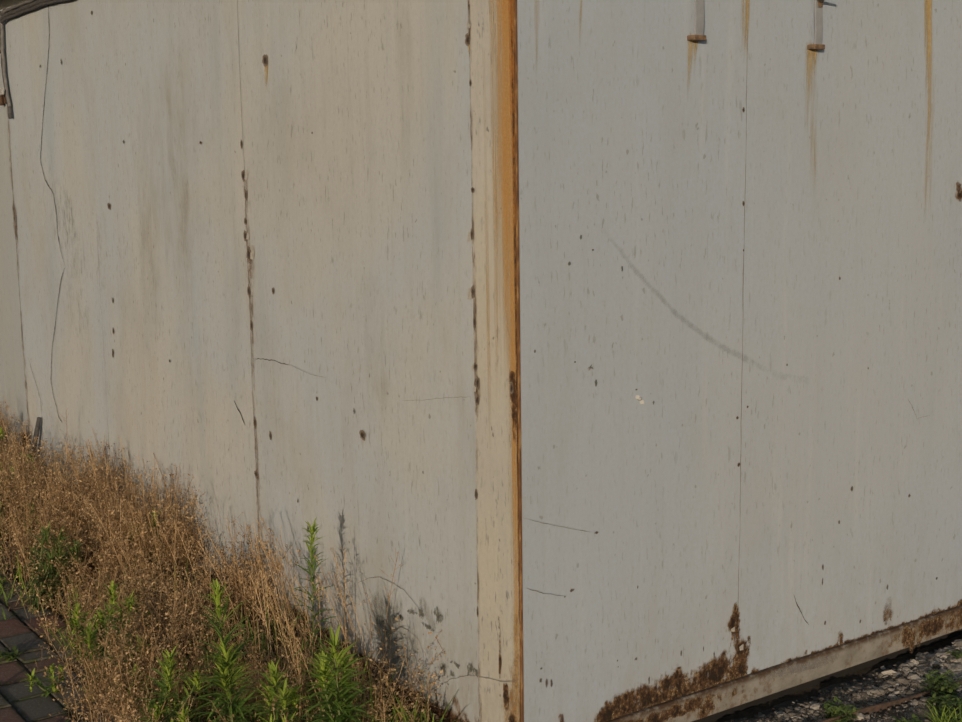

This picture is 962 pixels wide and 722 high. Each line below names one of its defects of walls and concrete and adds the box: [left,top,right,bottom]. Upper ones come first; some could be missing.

corrosion [594,603,759,722]
corrosion [776,599,962,676]